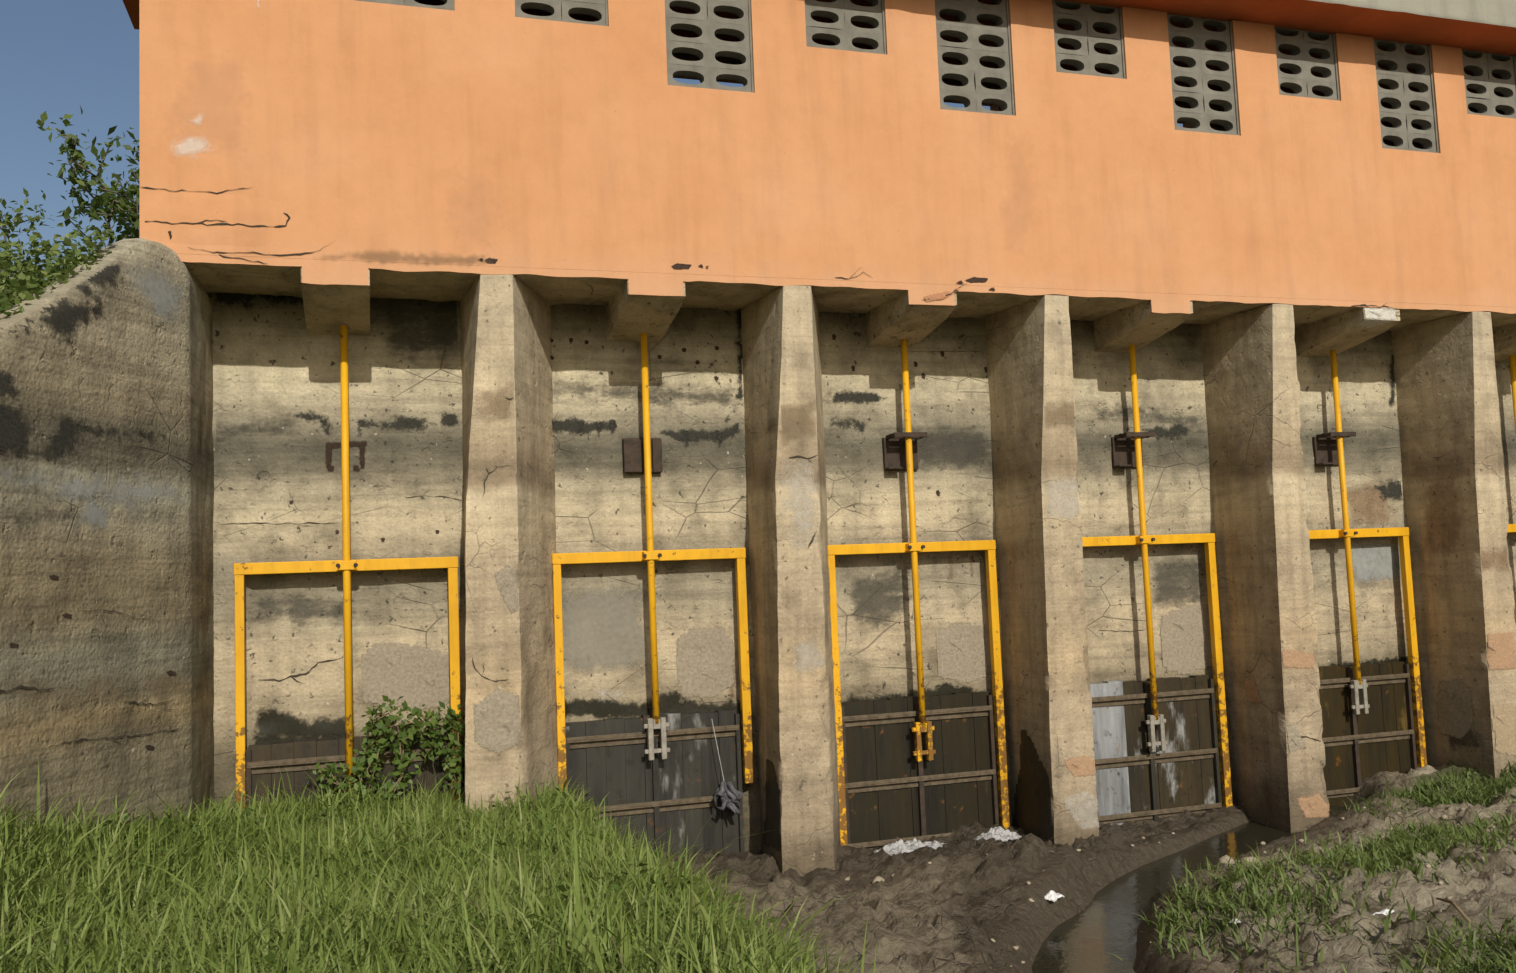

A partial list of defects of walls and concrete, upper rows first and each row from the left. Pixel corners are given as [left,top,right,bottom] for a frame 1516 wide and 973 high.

crack [142,187,334,264]
water stain [8,264,120,343]
water stain [578,309,743,404]
water stain [0,370,166,461]
water stain [552,418,617,436]
water stain [661,423,740,447]
crack [259,657,342,683]